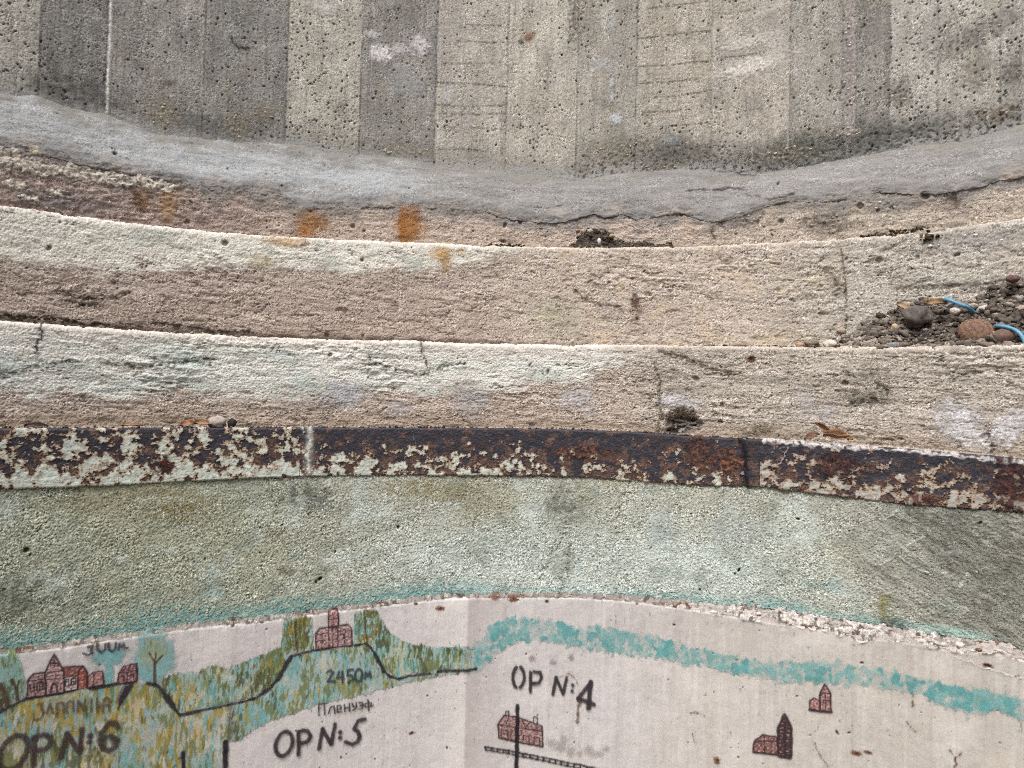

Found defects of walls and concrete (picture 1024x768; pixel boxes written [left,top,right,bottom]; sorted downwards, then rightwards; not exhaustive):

crack [0,279,250,384]
rust [148,454,172,472]
peeling [581,452,606,474]
rust [807,451,864,481]
peeling [916,458,963,497]
rust [986,456,1024,513]
rust [903,494,934,506]
spalling [673,598,692,609]